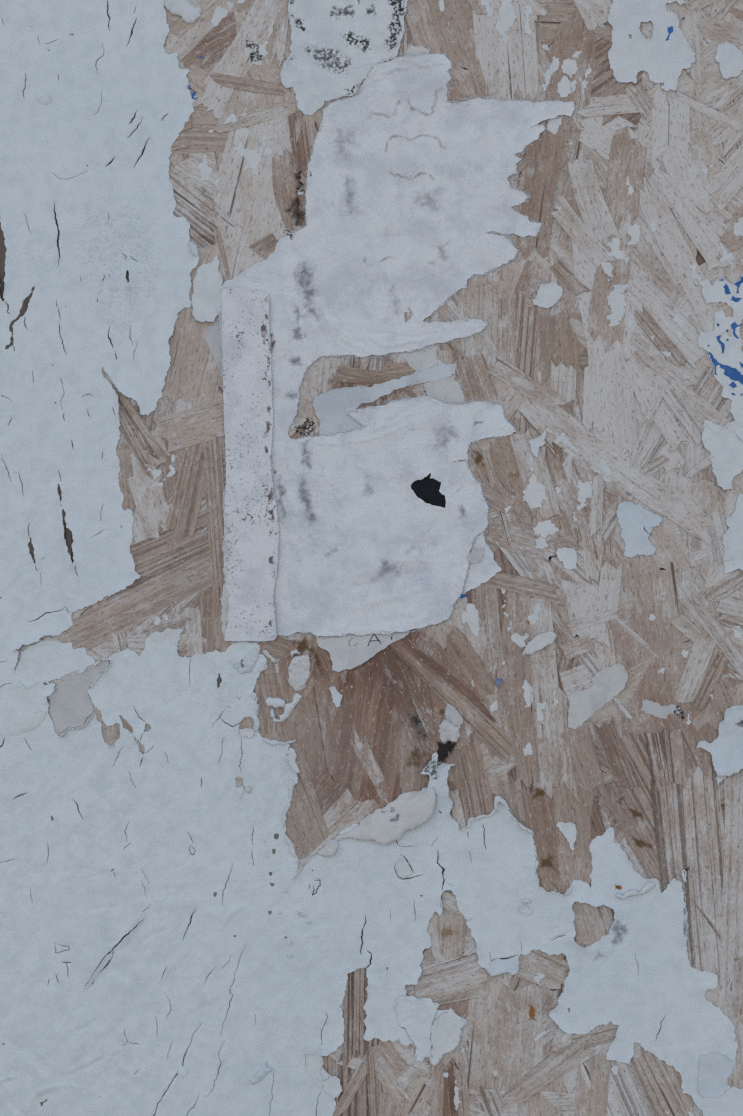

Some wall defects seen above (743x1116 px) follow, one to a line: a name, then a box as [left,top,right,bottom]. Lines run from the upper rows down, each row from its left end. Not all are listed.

crack [0,214,66,353]
crack [54,111,167,302]
peeling [15,0,363,754]
crack [28,525,41,577]
crack [57,380,115,576]
peeling [239,0,743,1116]